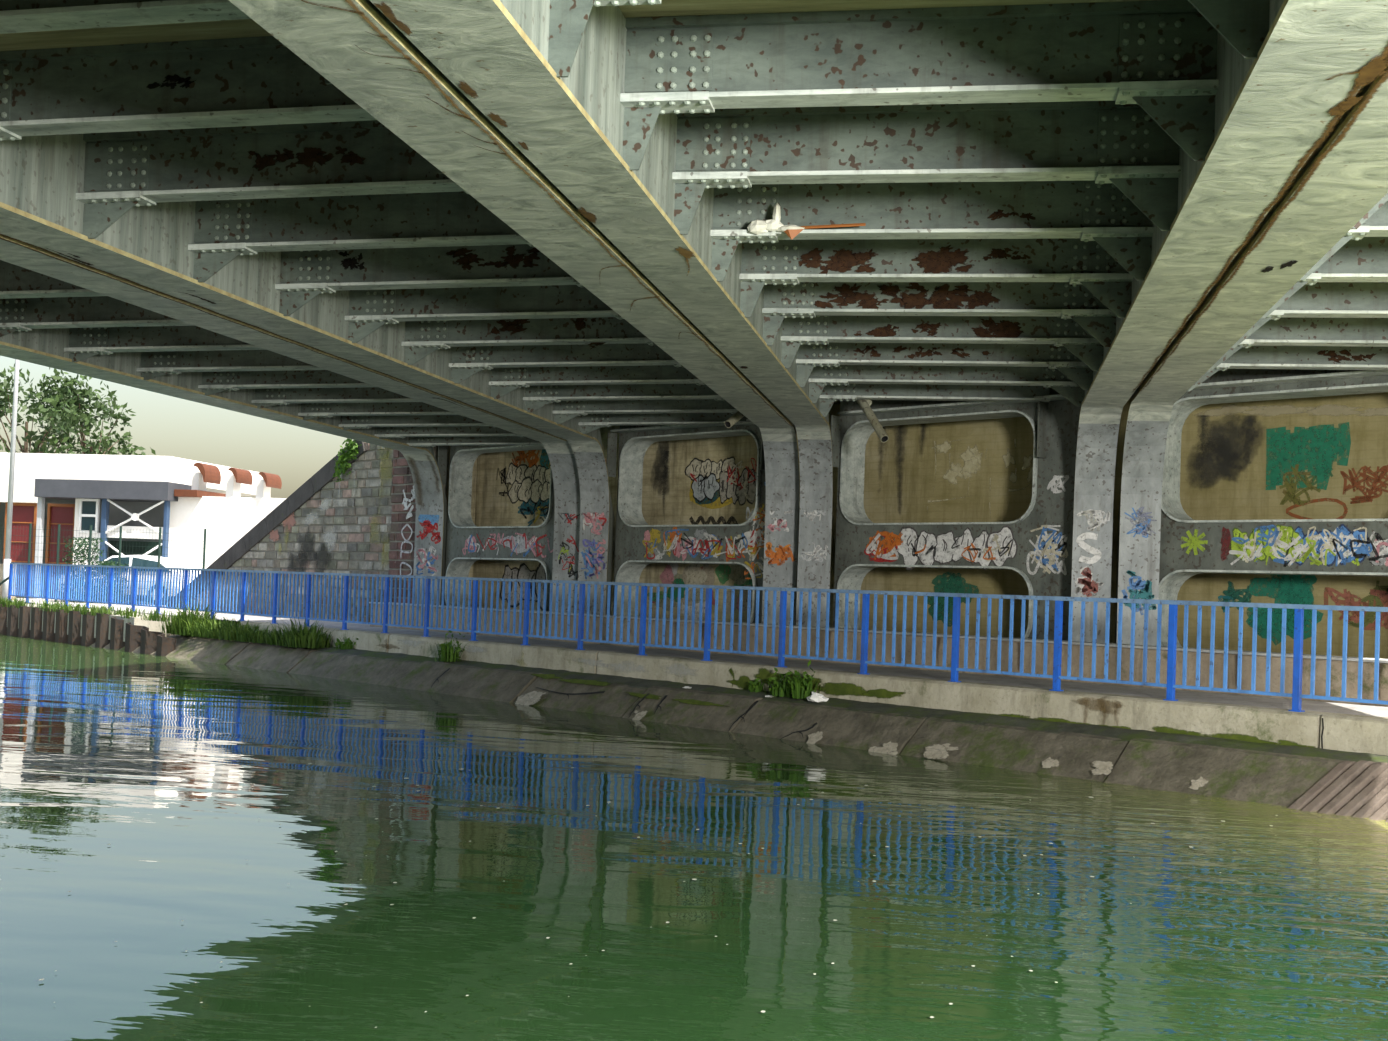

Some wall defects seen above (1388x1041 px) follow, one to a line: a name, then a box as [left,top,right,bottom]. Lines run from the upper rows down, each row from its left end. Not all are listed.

rust [0,234,549,434]
rust [248,146,366,171]
rust [301,0,791,426]
rust [798,245,1031,359]